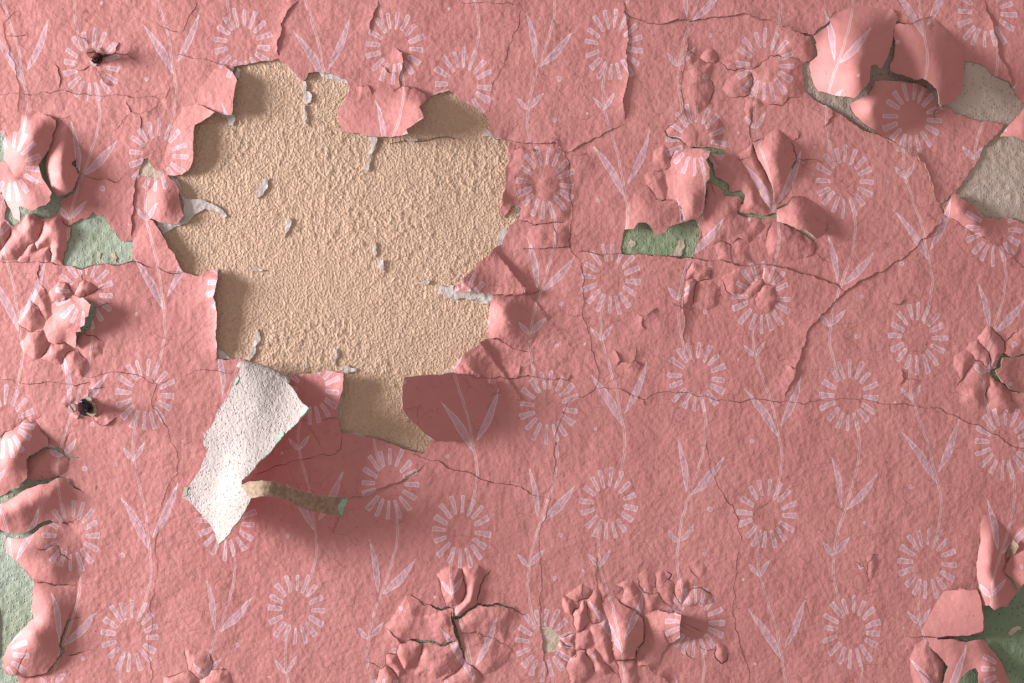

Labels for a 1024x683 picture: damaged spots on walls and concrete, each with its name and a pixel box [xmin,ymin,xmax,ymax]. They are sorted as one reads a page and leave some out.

crack [461,0,522,109]
crack [624,9,807,130]
peeling [802,7,1024,238]
flaking render [0,59,546,454]
crack [389,111,1024,676]
peeling [0,415,93,683]
peeling [907,514,1024,683]